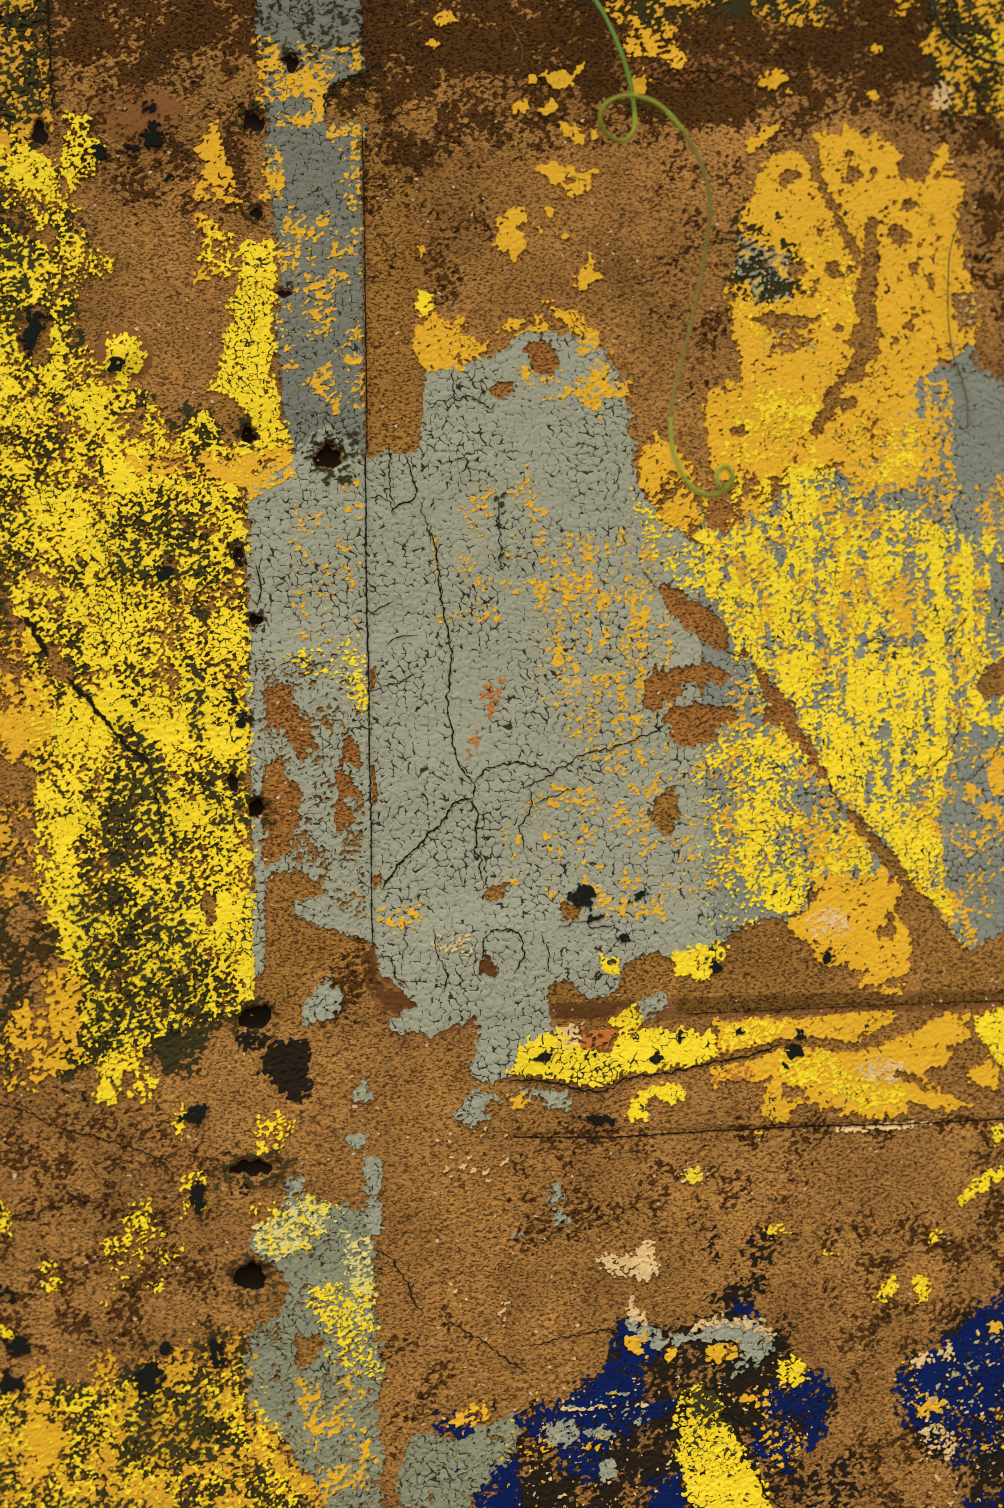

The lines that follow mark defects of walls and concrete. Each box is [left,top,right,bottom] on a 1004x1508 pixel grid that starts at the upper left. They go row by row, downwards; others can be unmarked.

spalling [845,150,877,184]
spalling [754,157,920,439]
spalling [522,332,560,377]
spalling [486,381,517,400]
crack [0,0,1004,1162]
spalling [642,582,827,779]
spalling [977,657,1004,701]
spalling [647,785,681,837]
spalling [258,684,415,1032]
spalling [546,804,1004,1067]
spalling [946,1038,984,1074]
crack [6,1199,99,1218]